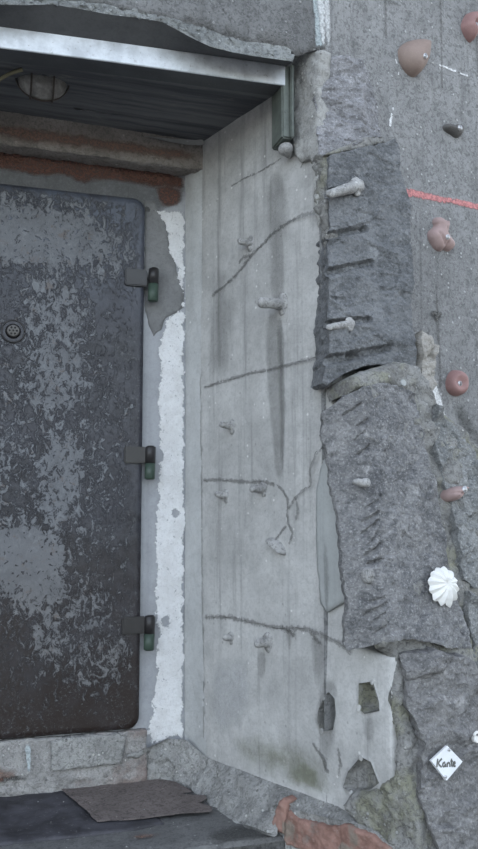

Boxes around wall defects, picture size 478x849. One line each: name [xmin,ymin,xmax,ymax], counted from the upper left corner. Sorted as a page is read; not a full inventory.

spalling [0,0,294,61]
peeling [147,211,186,744]
crack [205,447,323,537]
crack [206,616,344,647]
spalling [318,692,336,735]
spalling [356,678,380,714]
spalling [343,754,379,795]